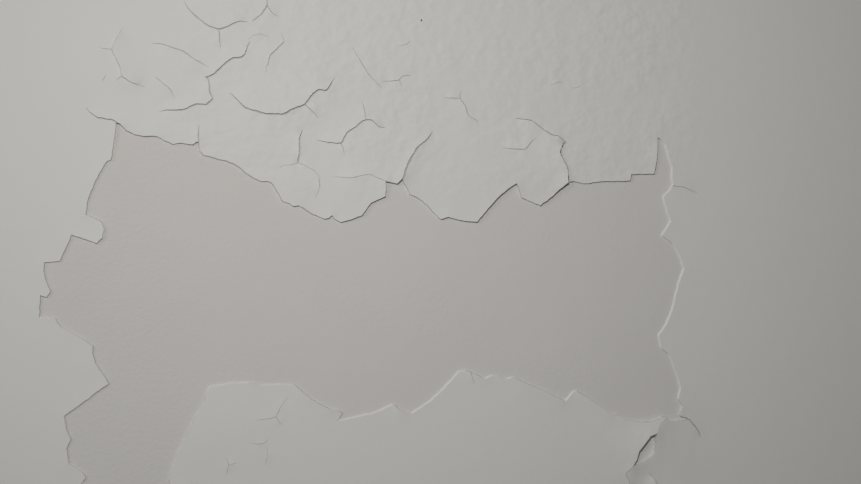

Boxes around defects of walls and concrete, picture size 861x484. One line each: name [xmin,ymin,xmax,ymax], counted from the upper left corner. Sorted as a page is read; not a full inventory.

crack [102,0,334,116]
crack [290,102,432,196]
crack [506,118,569,181]
peeling [39,110,687,484]